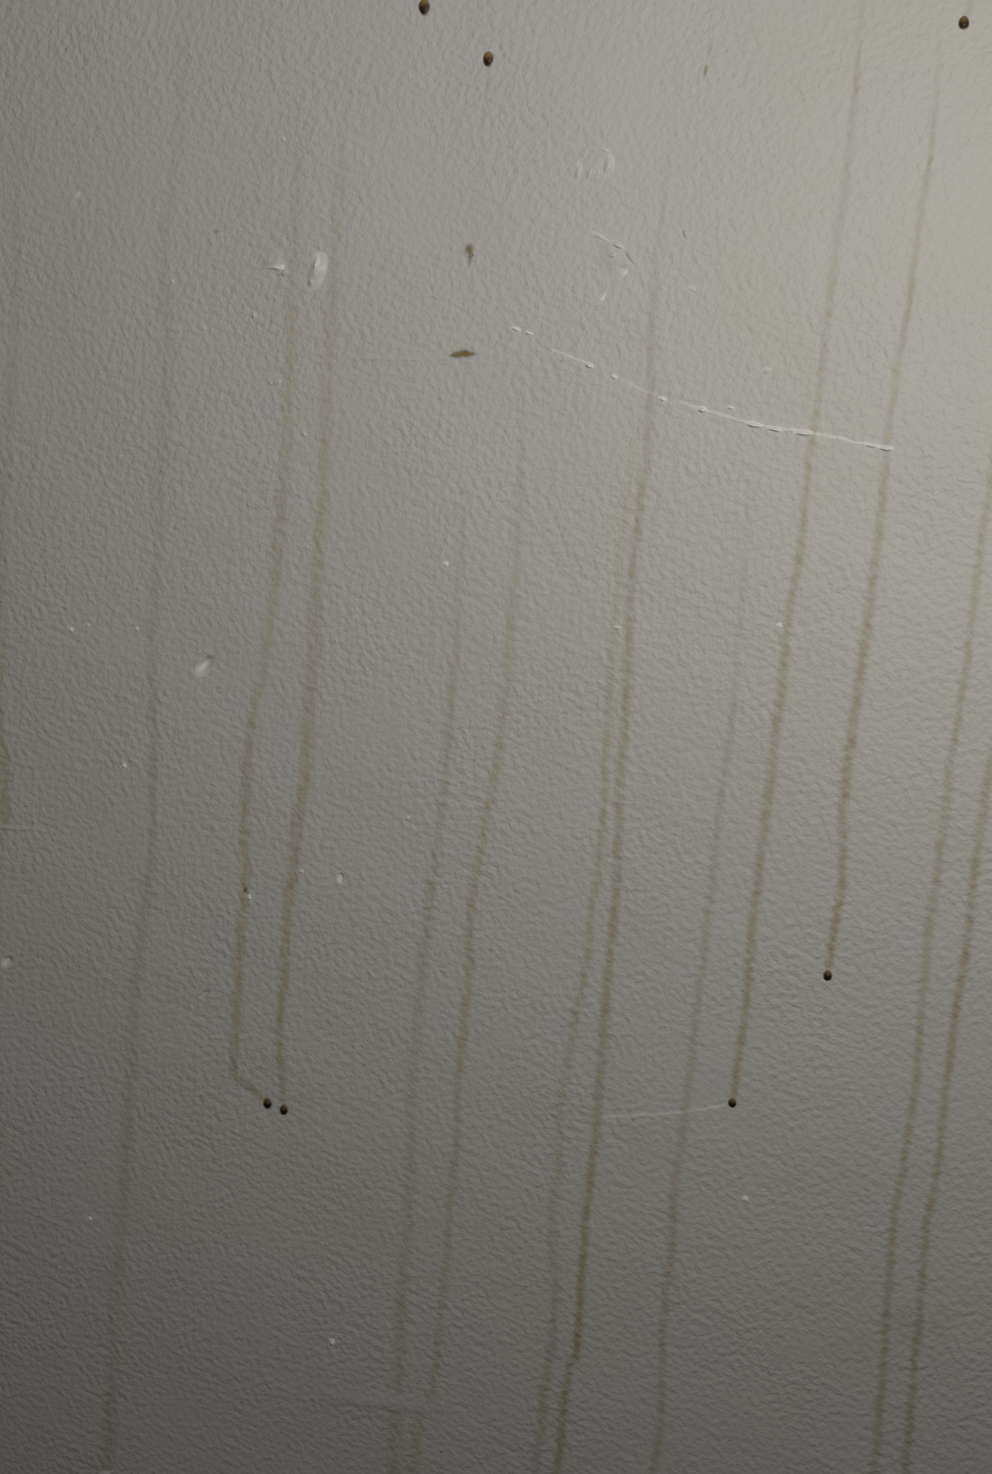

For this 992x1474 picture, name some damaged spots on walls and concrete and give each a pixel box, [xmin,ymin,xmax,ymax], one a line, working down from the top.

damp [264,1099,288,1115]